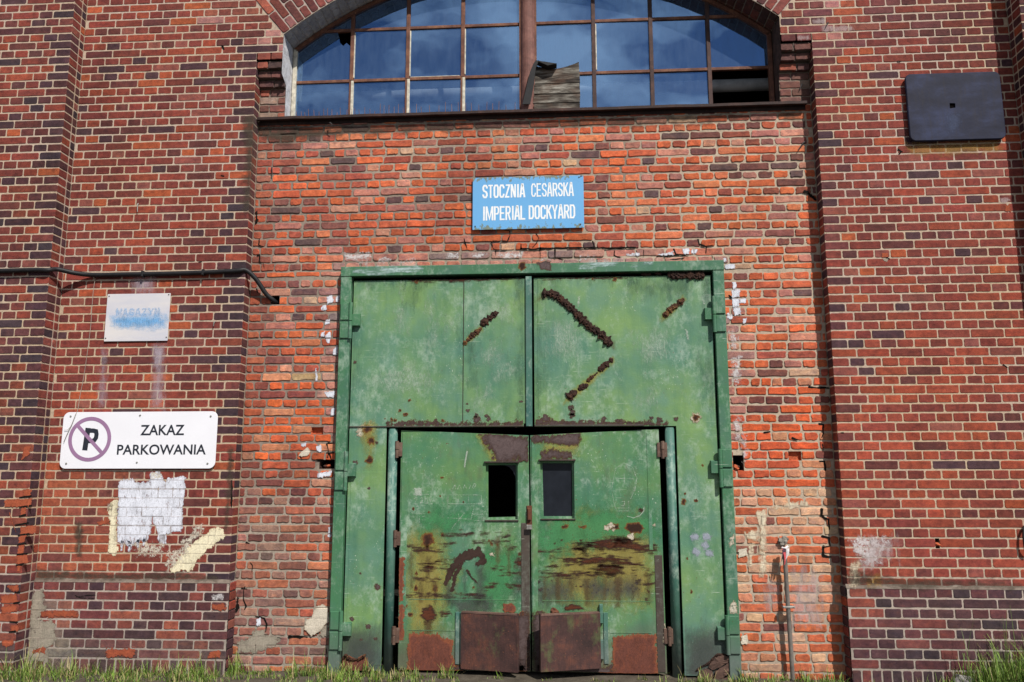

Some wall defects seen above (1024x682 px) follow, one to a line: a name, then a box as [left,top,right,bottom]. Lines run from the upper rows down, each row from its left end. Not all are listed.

corrosion [353,261,705,464]
hole [733,455,744,471]
corrosion [538,508,657,611]
damp [848,536,955,589]
peeling [288,624,329,639]
corrosion [398,531,521,671]
corrosion [503,603,545,671]
corrosion [562,633,658,674]